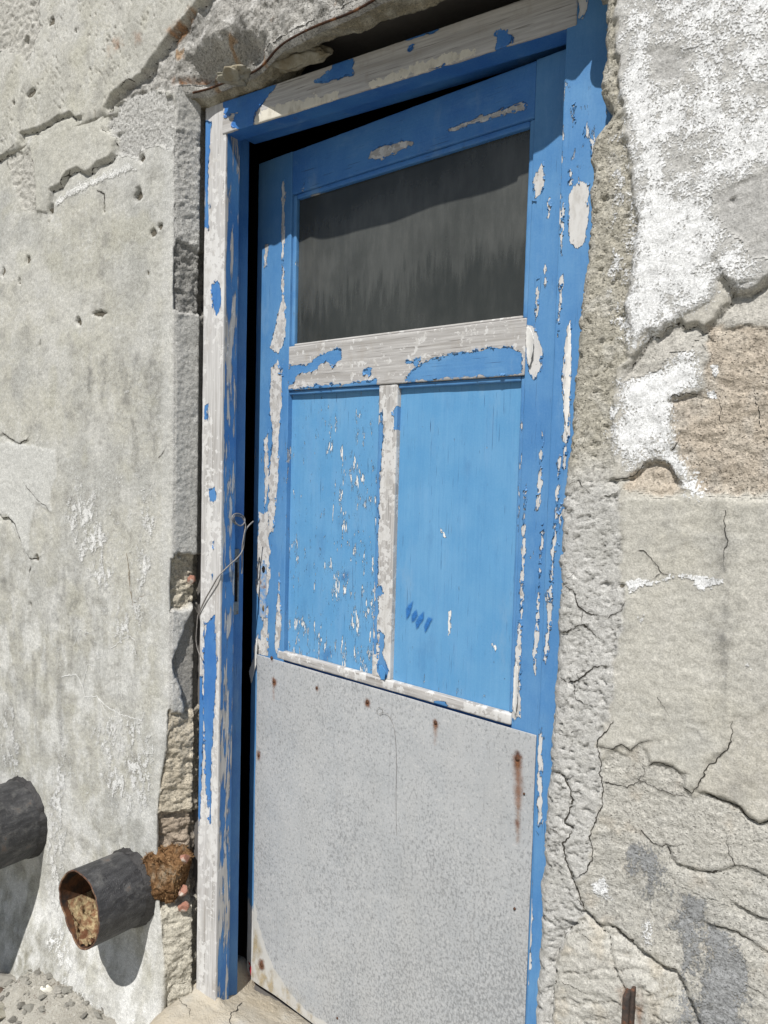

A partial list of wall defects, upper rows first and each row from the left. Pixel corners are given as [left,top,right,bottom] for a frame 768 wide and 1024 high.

spalling [50,0,376,213]
crack [53,116,119,204]
peeling [532,161,570,235]
peeling [572,0,768,505]
peeling [273,347,374,388]
peeling [405,327,544,379]
peeling [557,321,572,478]
peeling [249,580,282,683]
peeling [372,613,389,680]
peeling [512,494,563,721]
crack [561,665,605,704]
crack [551,721,768,1019]